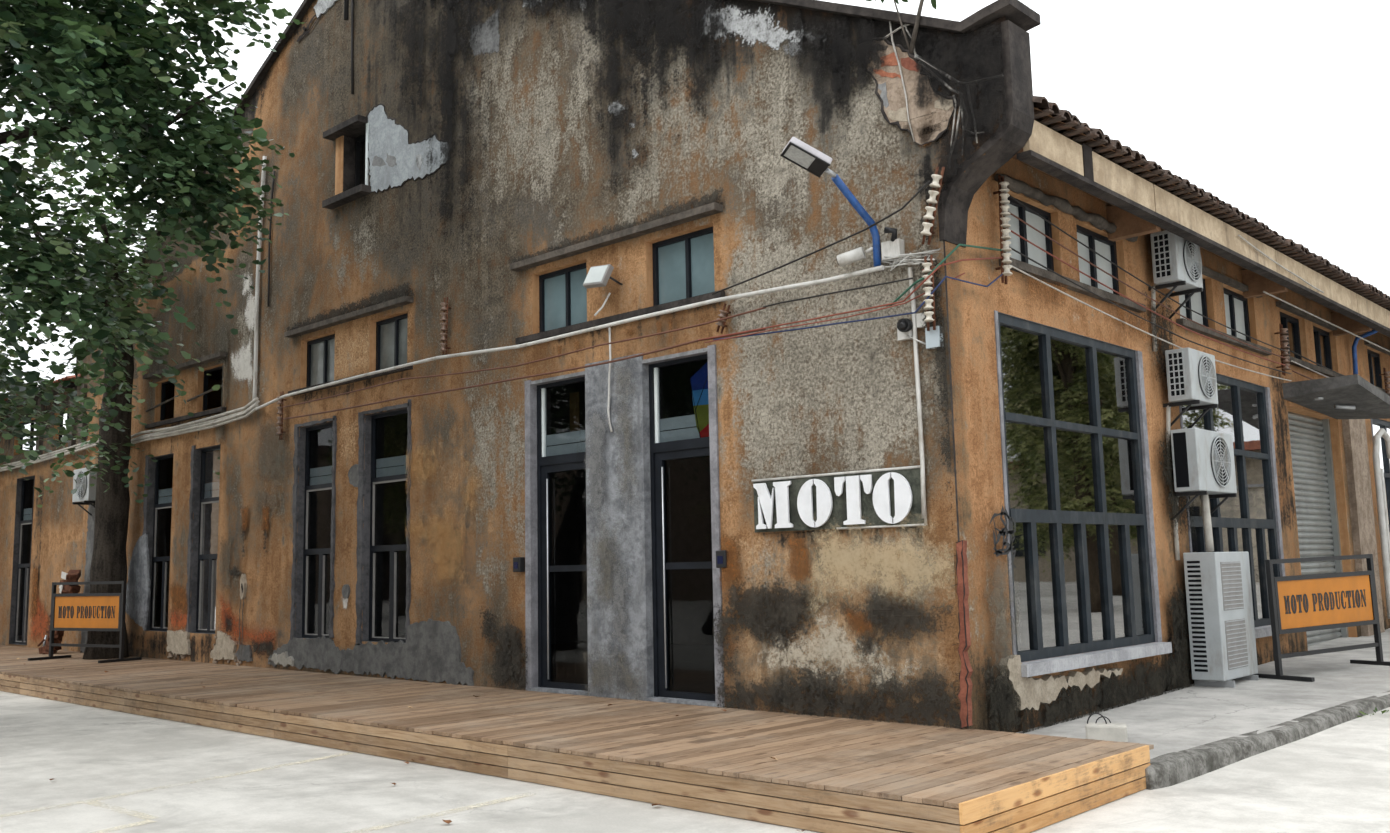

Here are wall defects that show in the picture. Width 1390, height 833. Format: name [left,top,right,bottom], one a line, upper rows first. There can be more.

peeling [302,0,338,39]
peeling [701,2,826,56]
spalling [366,103,451,193]
damp [384,0,728,238]
spalling [866,37,956,146]
rust [219,598,275,658]
damp [479,606,528,690]
damp [712,571,961,729]
spalling [949,540,973,729]
peeling [999,655,1123,710]